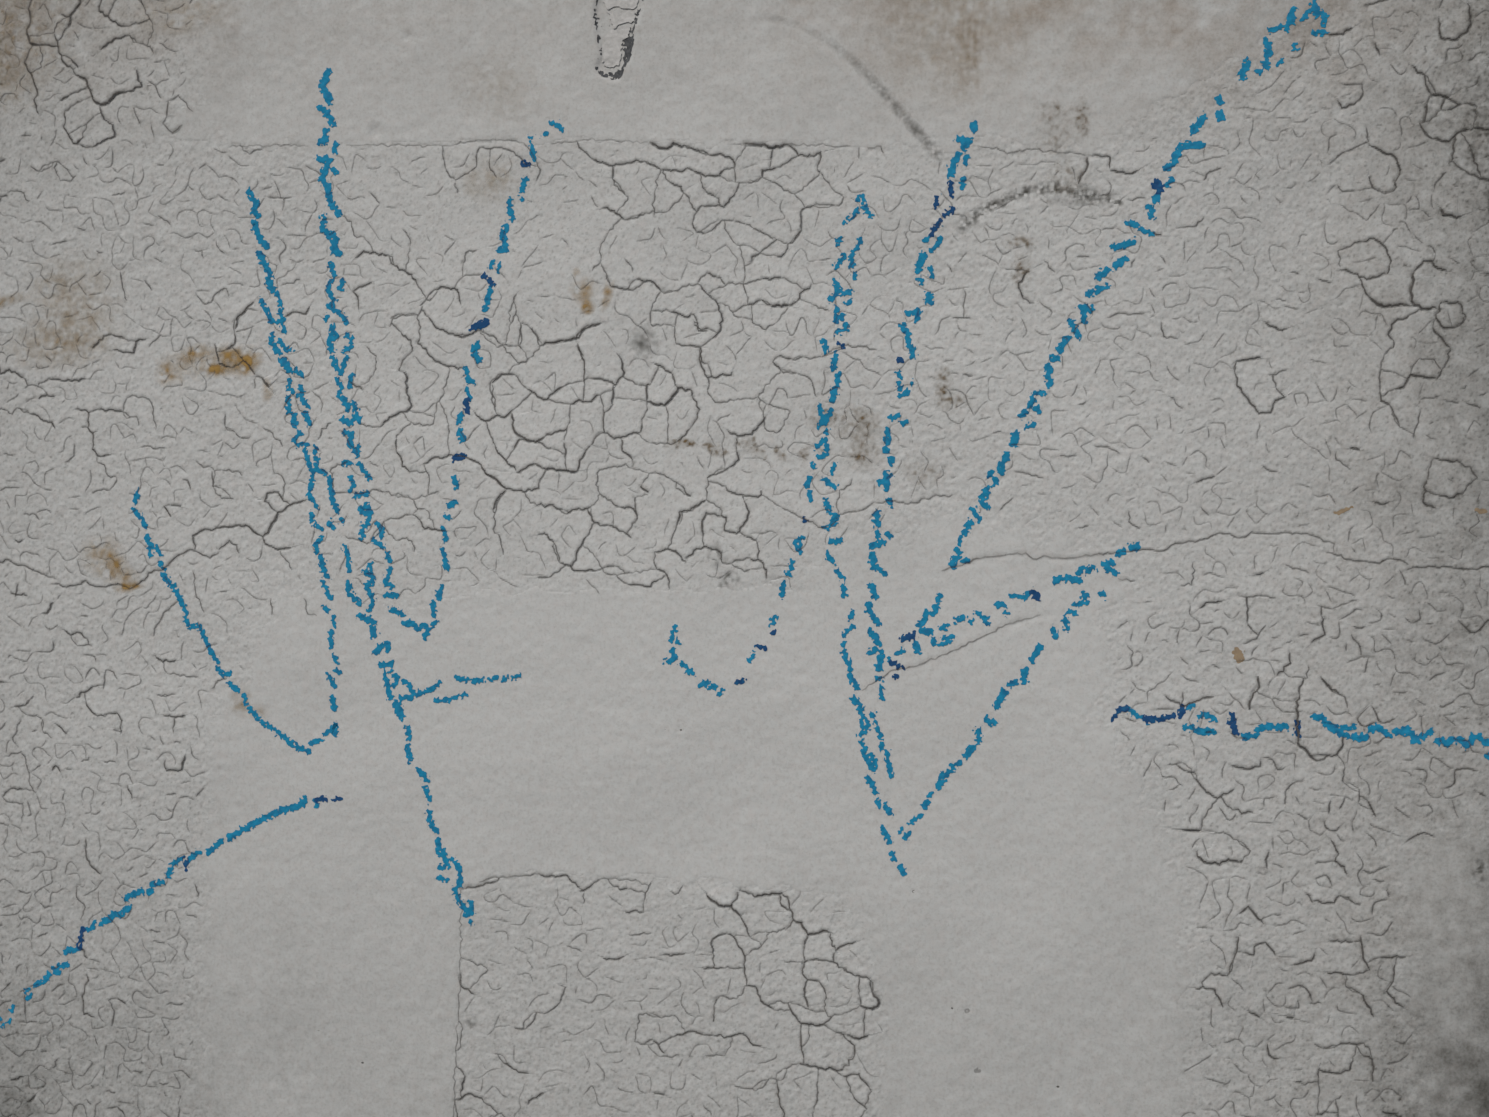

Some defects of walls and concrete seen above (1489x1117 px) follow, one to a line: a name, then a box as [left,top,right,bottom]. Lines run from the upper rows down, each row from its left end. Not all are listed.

crack [0,126,346,1117]
corrosion [208,350,253,374]
crack [857,5,1489,1117]